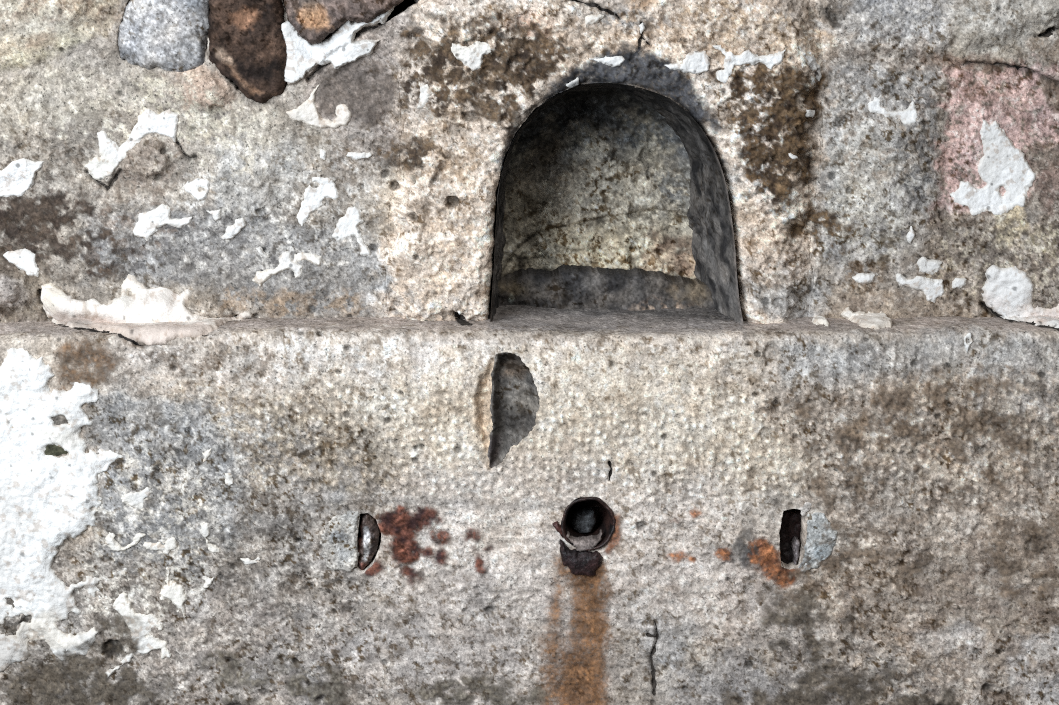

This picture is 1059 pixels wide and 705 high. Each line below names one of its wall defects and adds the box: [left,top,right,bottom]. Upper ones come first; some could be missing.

crack [1035,27,1059,37]
crack [969,61,1040,74]
peeling [0,158,44,198]
peeling [84,108,179,181]
peeling [950,120,1036,216]
peeling [982,265,1059,328]
peeling [0,347,123,672]
corrosion [378,505,449,583]
corrosion [466,529,492,574]
corrosion [715,548,731,560]
corrosion [747,539,796,588]
corrosion [542,556,607,705]